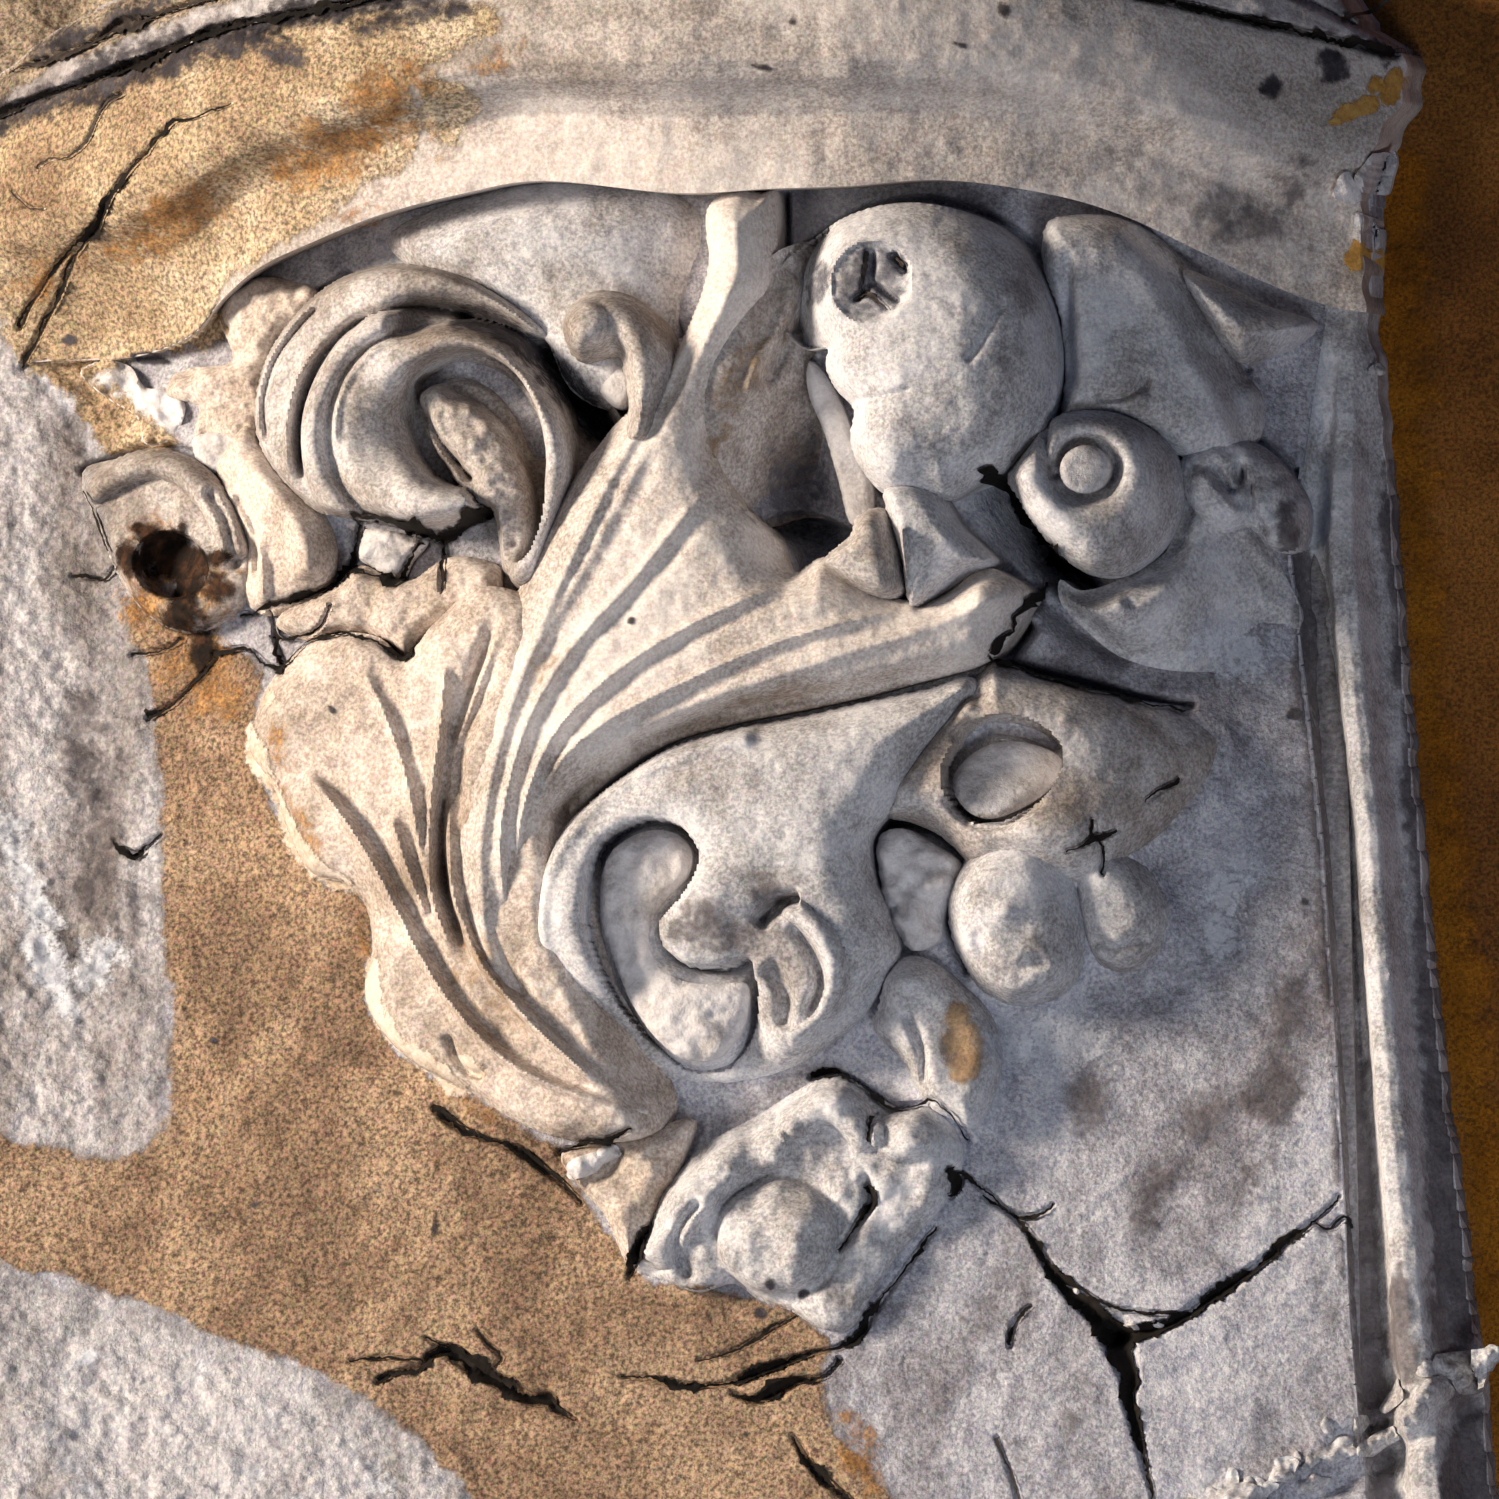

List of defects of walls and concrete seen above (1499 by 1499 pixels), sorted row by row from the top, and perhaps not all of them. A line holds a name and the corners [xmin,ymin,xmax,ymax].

crack [16,103,231,368]
crack [71,490,114,581]
rust [115,515,244,720]
crack [131,506,494,722]
spalling [0,0,891,1499]
spalling [1286,708,1300,720]
crack [432,1105,632,1205]
crack [349,1329,576,1421]
crack [621,1067,1353,1499]